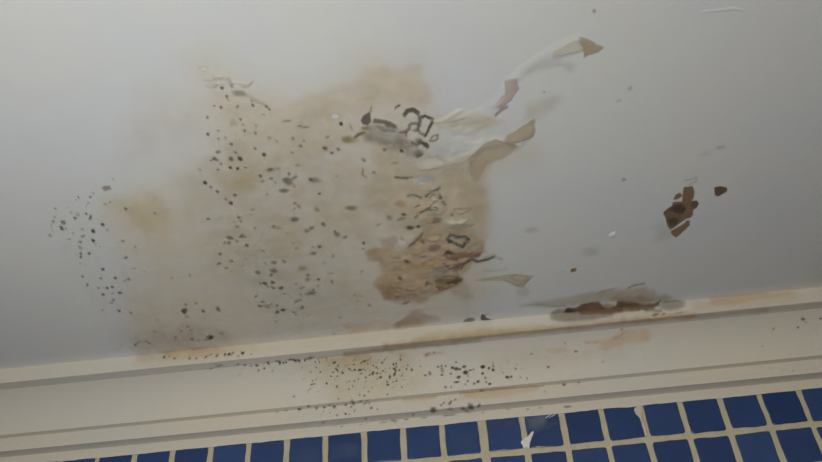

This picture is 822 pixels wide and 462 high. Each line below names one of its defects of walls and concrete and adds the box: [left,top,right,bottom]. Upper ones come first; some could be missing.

leakage [354,105,448,153]
leakage [378,167,484,236]
flaking render [369,34,603,301]
peeling [664,186,699,237]